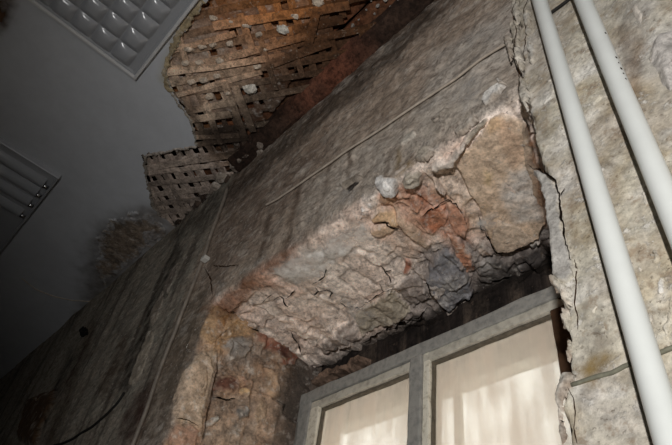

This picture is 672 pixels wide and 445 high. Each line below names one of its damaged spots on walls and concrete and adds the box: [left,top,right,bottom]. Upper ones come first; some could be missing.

crack [511,2,527,112]
spalling [94,0,329,286]
peeling [165,305,298,445]
crack [312,265,393,311]
crack [363,282,434,343]
spalling [319,112,547,354]
crack [529,165,578,329]
peeling [555,372,576,445]
peeling [560,308,573,363]